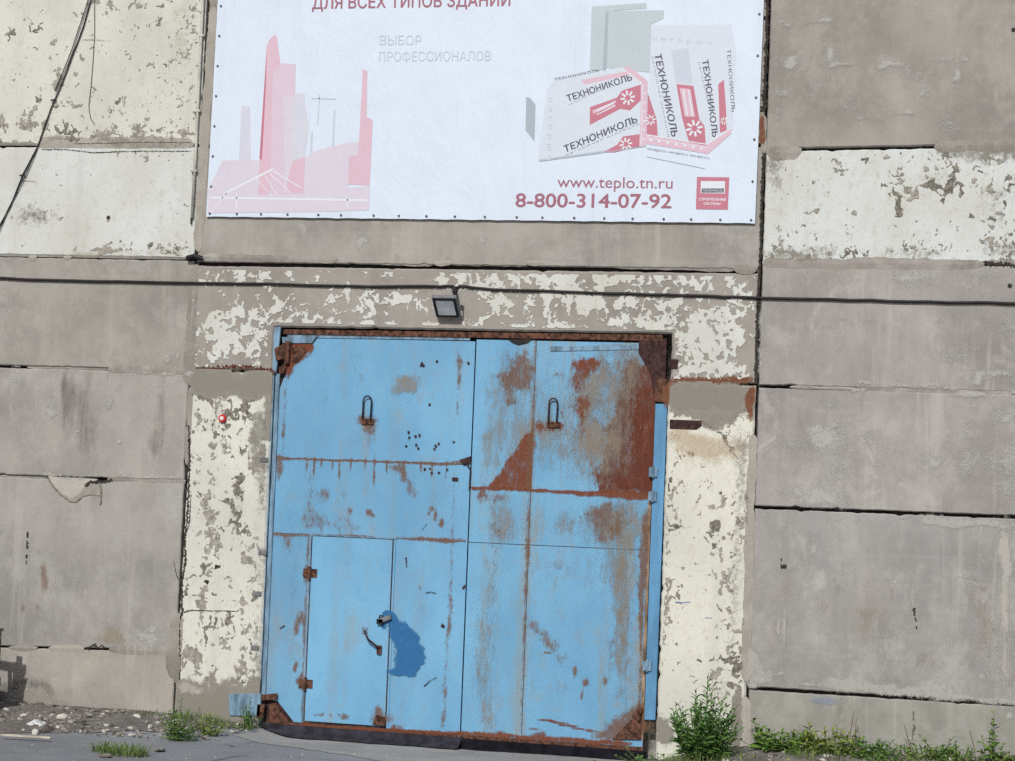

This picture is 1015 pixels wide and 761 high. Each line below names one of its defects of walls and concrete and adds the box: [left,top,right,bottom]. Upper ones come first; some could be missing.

peeling [0,0,201,162]
peeling [90,240,190,256]
peeling [764,208,952,260]
peeling [861,144,1015,260]
corrosion [201,343,314,377]
spalling [48,475,112,505]
corrosion [274,510,372,581]
corrosion [277,456,462,492]
corrosion [405,536,465,544]
peeling [175,270,756,746]
corrosion [471,347,756,654]
corrosion [282,597,649,746]